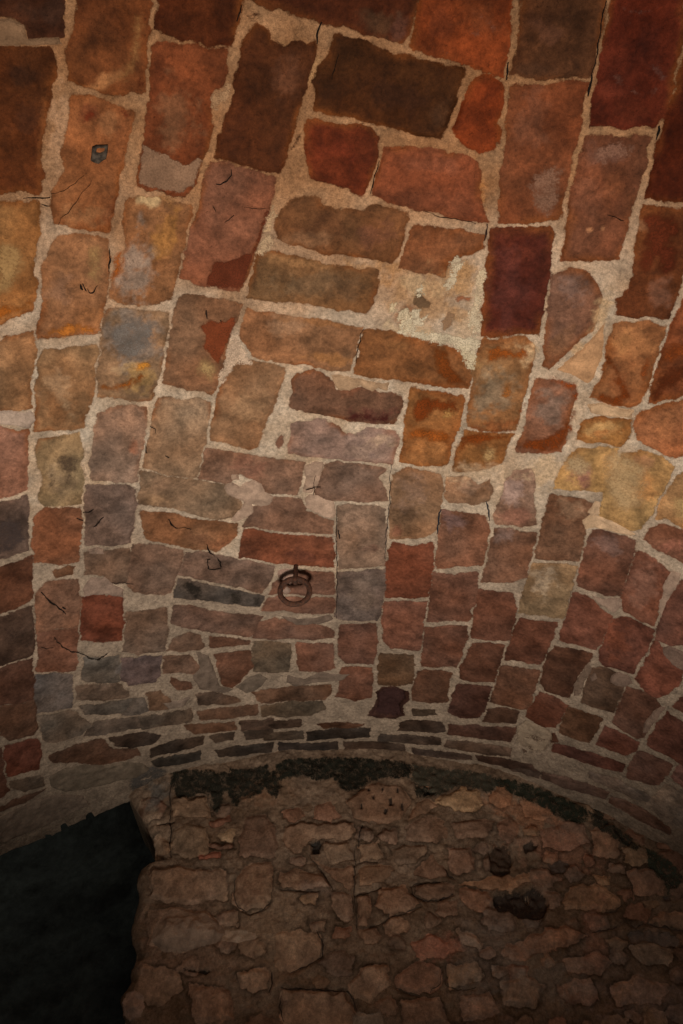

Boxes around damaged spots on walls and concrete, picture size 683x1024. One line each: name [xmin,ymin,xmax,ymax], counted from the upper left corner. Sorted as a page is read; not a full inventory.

crack [42,177,92,225]
crack [168,519,222,570]
crack [41,637,108,661]